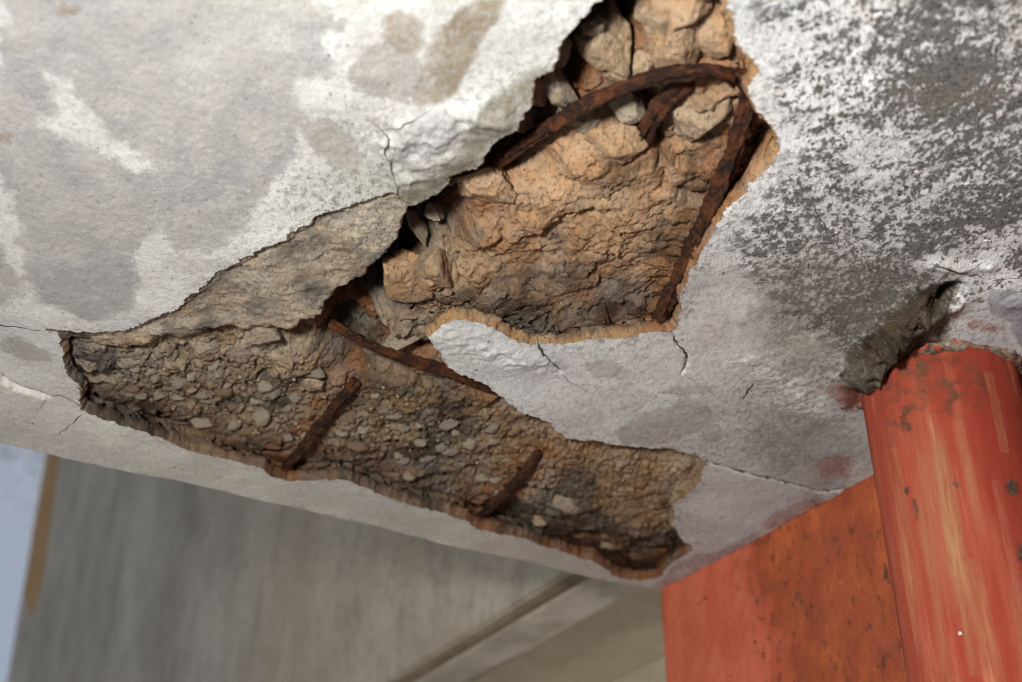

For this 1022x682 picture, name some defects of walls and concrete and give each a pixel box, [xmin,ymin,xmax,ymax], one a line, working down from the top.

damp [350,0,501,103]
damp [0,0,358,320]
crack [368,110,431,199]
damp [403,70,545,201]
peeling [732,0,1022,354]
spalling [45,0,789,580]
crack [537,337,591,394]
damp [833,280,958,410]
crack [713,462,840,492]
peeling [1006,478,1019,496]